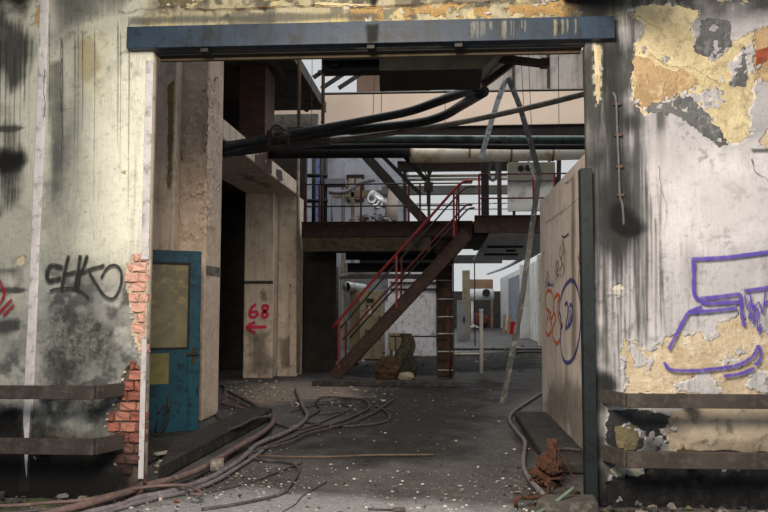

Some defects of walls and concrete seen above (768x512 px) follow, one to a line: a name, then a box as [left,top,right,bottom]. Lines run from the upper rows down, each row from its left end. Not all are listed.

flaking render [158,0,207,9]
flaking render [315,2,384,21]
flaking render [400,2,493,20]
flaking render [502,0,577,18]
flaking render [626,4,768,149]
flaking render [619,301,768,394]
flaking render [103,253,152,499]
flaking render [605,409,670,451]